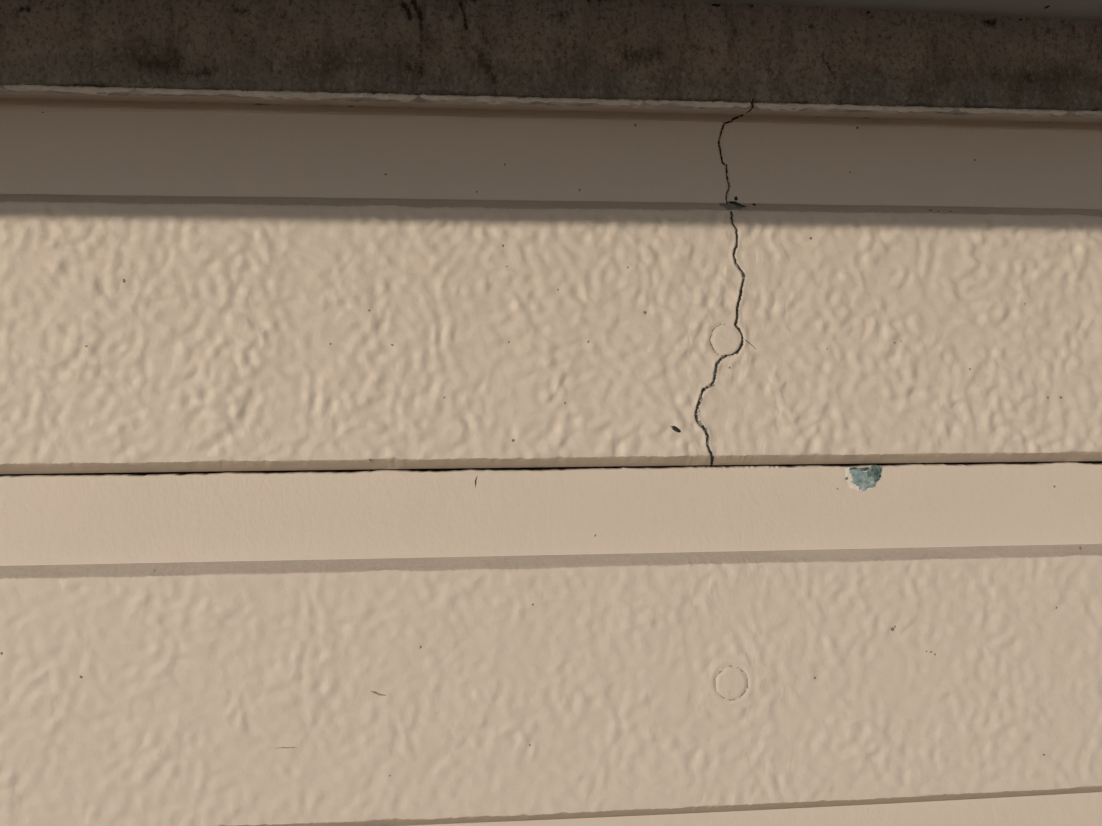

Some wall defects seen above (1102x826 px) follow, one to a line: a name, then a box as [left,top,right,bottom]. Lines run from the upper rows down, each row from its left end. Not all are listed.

crack [695,98,756,466]
peeling [844,465,883,491]